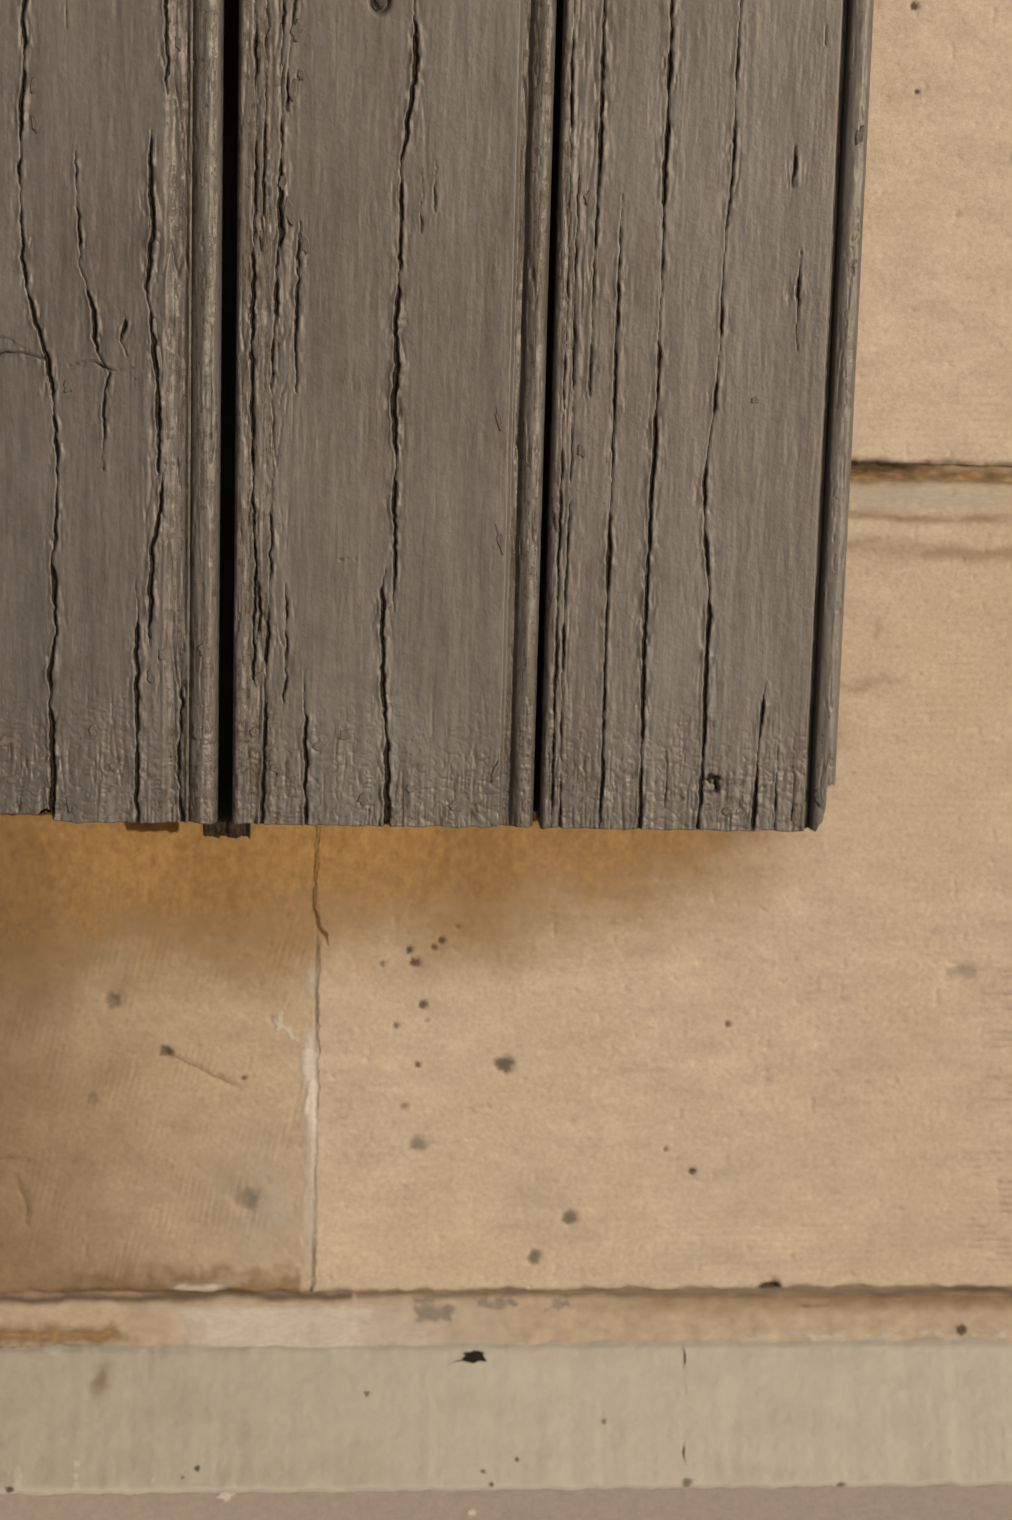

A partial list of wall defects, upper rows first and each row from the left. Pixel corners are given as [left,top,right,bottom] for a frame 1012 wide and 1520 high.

crack [0,0,184,822]
crack [250,0,329,1286]
crack [343,0,436,825]
crack [794,270,802,348]